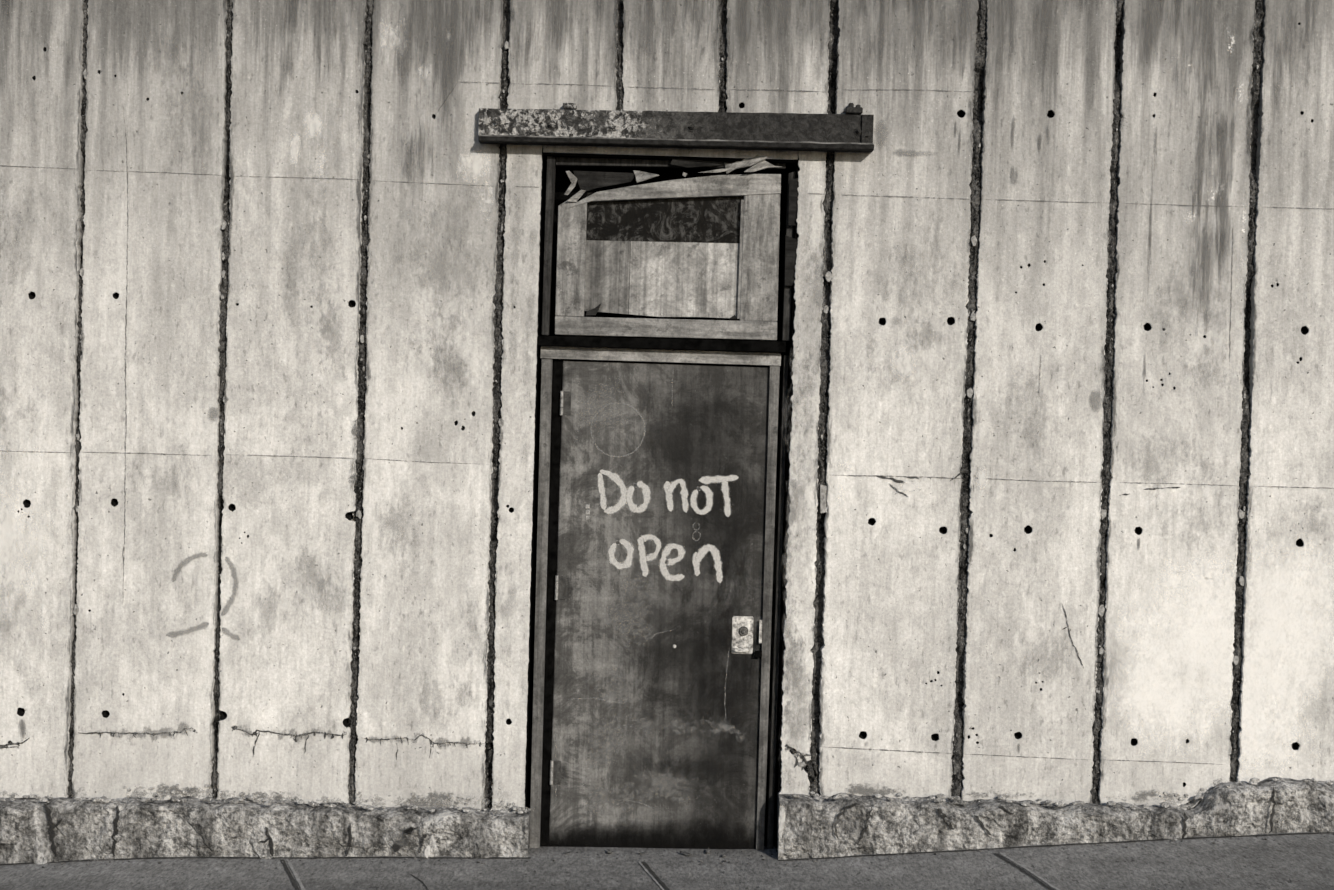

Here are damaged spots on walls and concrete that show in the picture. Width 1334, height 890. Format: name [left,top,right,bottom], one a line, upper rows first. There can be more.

water stain [426,0,467,104]
water stain [1175,0,1234,303]
crack [1062,605,1084,668]
crack [0,738,29,749]
crack [82,728,197,738]
crack [232,726,484,760]